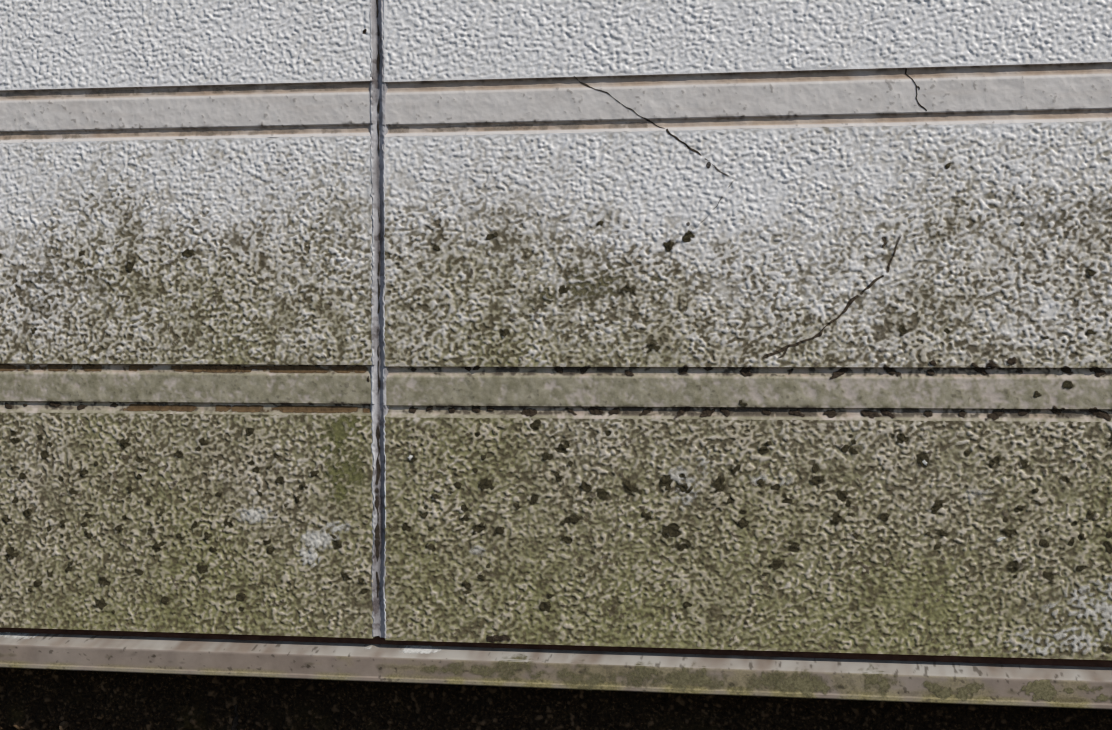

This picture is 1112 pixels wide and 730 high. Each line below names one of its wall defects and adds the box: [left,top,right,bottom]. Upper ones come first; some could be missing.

crack [905,68,927,111]
crack [574,76,730,208]
damp [566,254,622,305]
crack [763,237,901,358]
damp [321,414,365,502]
damp [669,466,694,508]
efflorescence [239,507,272,523]
efflorescence [300,521,350,567]
efflorescence [1011,577,1112,655]